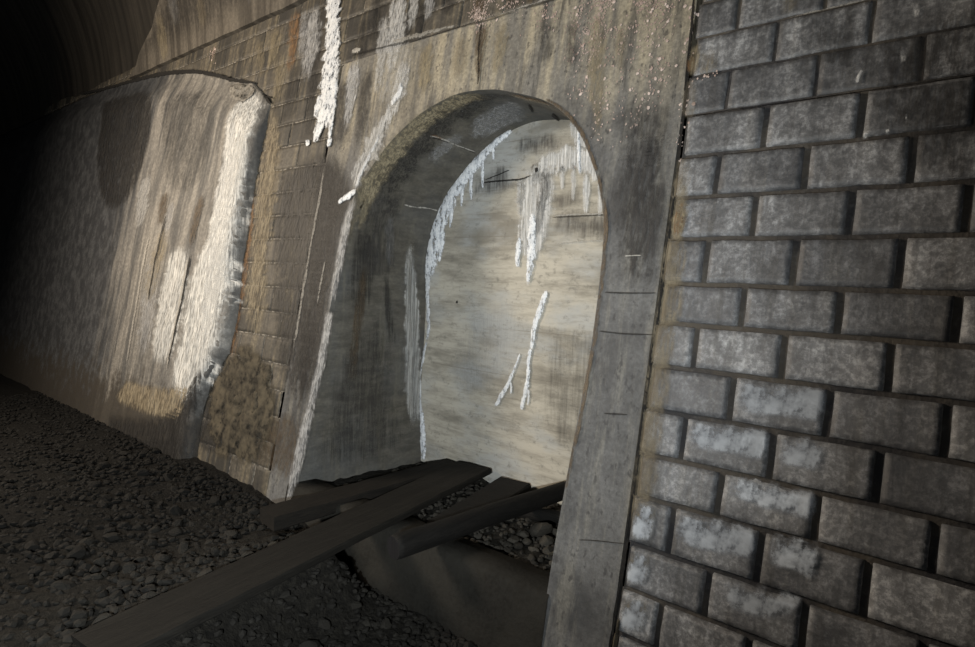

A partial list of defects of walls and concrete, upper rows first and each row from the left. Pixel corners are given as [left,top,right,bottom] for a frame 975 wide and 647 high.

crack [475,0,545,84]
leakage [97,92,150,208]
leakage [109,95,279,459]
leakage [259,314,332,500]
leakage [299,0,520,459]
leakage [495,291,547,409]
leakage [515,124,604,282]
leakage [620,116,665,275]